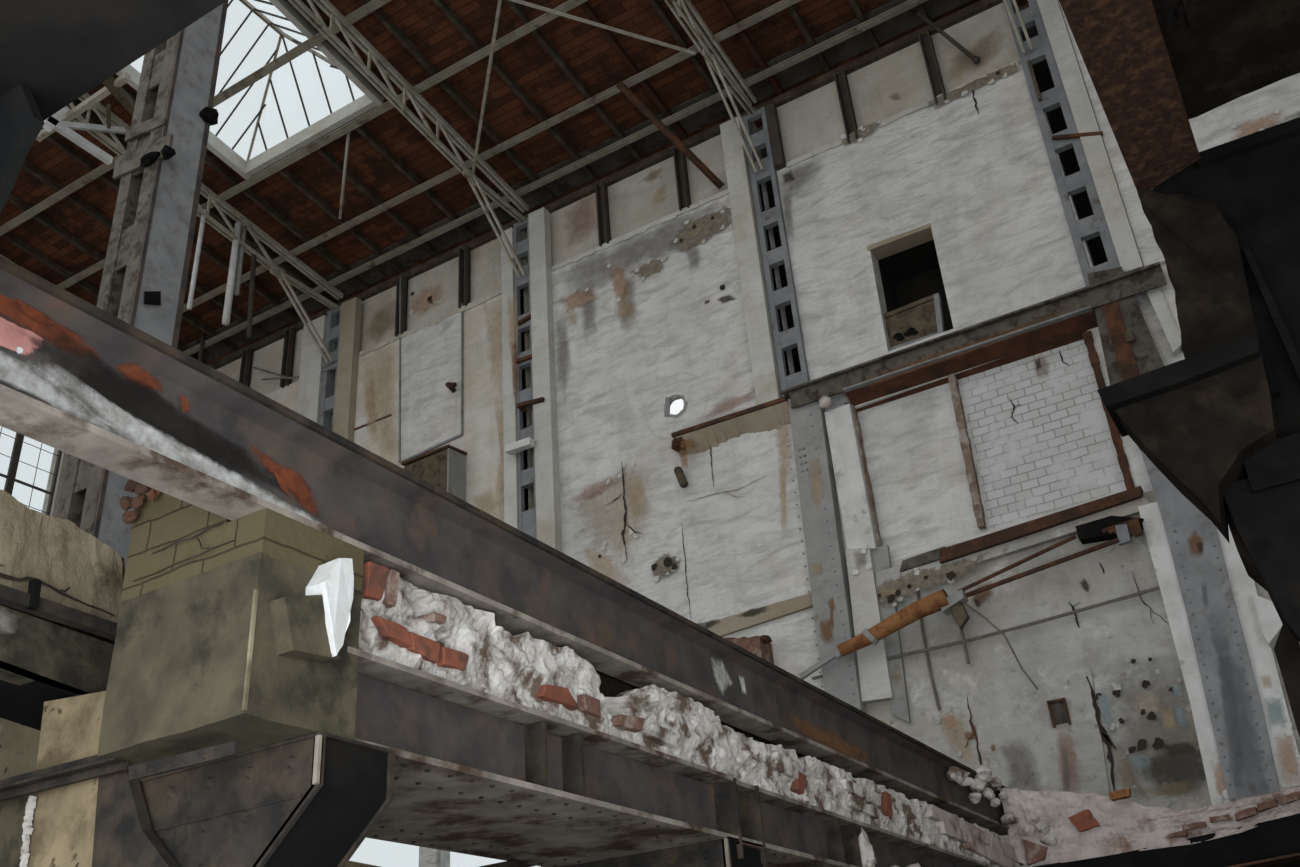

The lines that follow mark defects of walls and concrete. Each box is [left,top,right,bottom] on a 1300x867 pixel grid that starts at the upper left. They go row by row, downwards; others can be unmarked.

flaking render [607,204,733,302]
corrosion [0,294,94,356]
crack [605,462,643,557]
spalling [651,550,680,582]
spalling [876,547,986,607]
spalling [359,561,1024,867]
crack [1086,676,1117,791]
peeling [1101,657,1191,790]
leakage [1151,743,1206,793]
spalling [19,795,37,867]